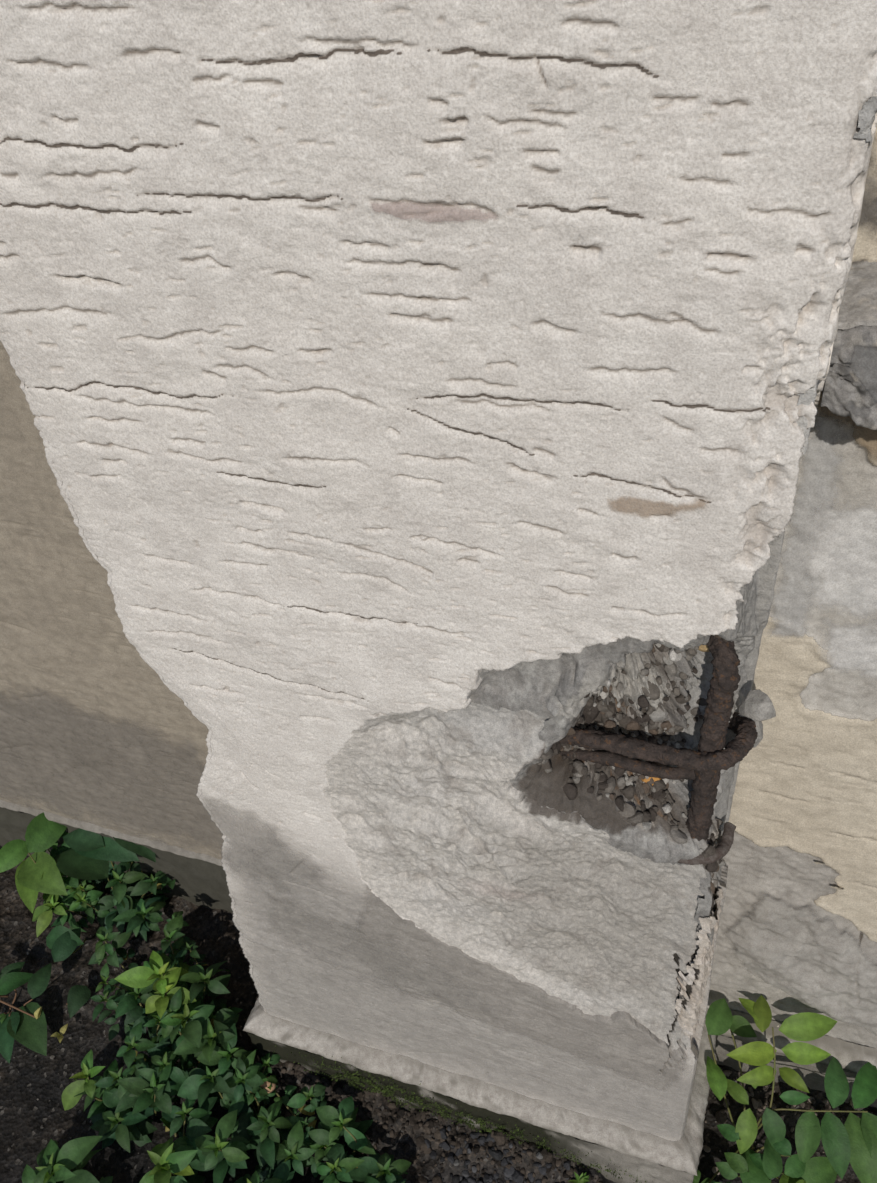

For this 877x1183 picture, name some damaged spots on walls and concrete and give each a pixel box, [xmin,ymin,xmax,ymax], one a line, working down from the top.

crack [202,47,659,78]
crack [1,137,183,152]
crack [0,193,343,215]
crack [517,205,644,218]
crack [27,381,223,399]
crack [652,400,770,412]
crack [407,394,621,456]
crack [217,472,326,488]
crack [573,473,711,503]
flaking render [324,380,877,1051]
corrosion [519,754,632,834]
crack [667,953,700,1059]